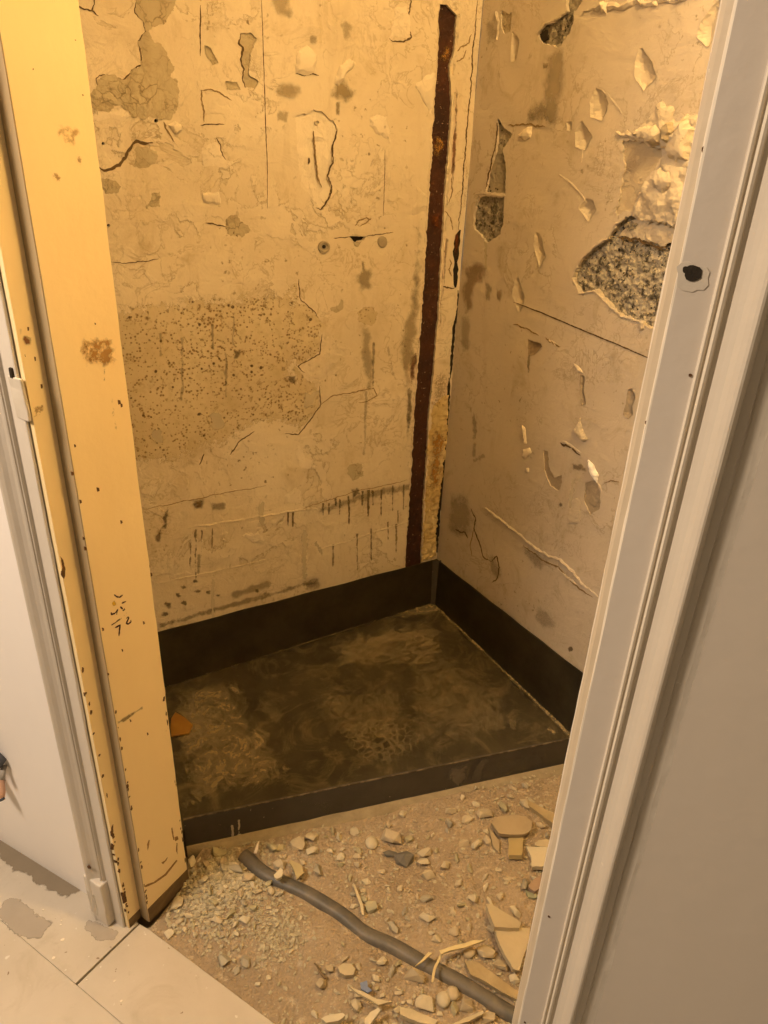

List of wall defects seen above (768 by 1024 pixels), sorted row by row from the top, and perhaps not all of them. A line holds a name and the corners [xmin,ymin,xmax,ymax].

peeling [82,0,180,122]
peeling [225,33,258,90]
spalling [537,0,583,47]
crack [99,89,236,172]
spalling [475,120,512,268]
spalling [572,131,675,331]
rust [321,4,460,567]
crack [435,0,500,582]
rust [83,340,112,364]
crack [319,388,377,406]
water stain [160,528,270,627]
crack [523,545,592,597]